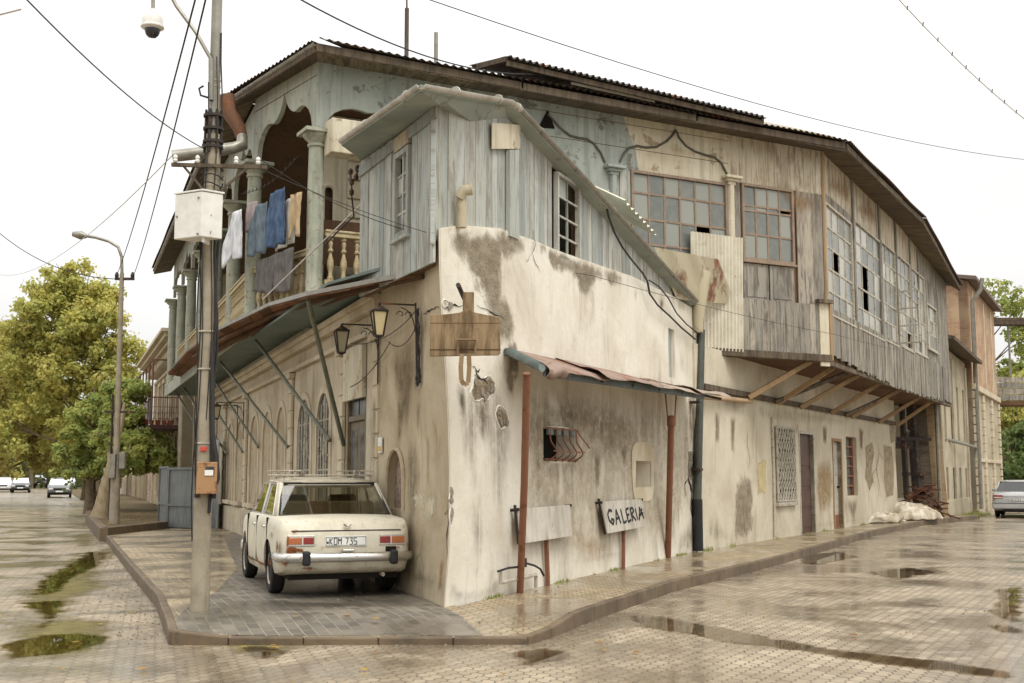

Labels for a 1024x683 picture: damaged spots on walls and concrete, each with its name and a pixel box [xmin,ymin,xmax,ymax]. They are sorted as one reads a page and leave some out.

peeling [454,232,522,391]
spalling [469,374,509,430]
spalling [865,425,896,498]
water stain [736,480,752,535]